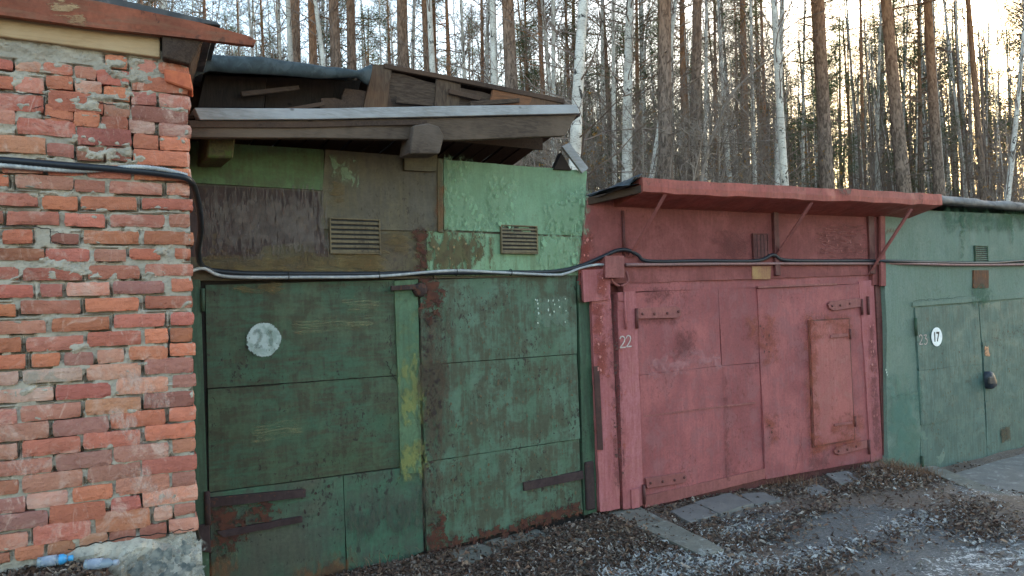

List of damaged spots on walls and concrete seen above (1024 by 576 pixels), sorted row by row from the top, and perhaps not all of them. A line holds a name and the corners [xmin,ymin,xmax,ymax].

rust [425,502,583,553]